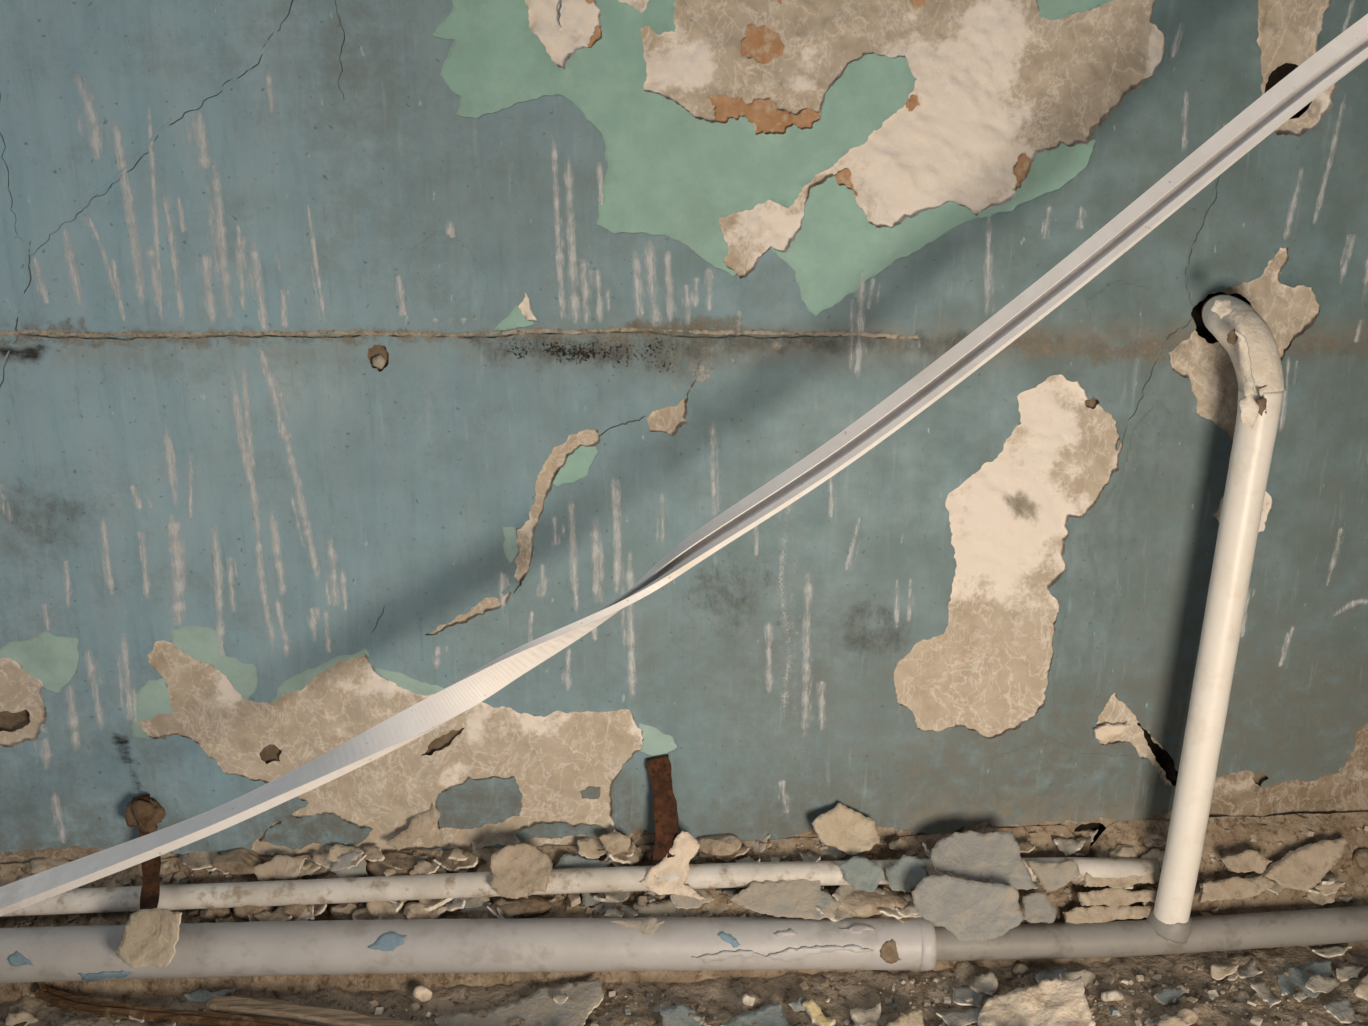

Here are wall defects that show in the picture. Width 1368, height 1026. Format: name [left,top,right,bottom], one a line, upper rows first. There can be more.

crack [0,0,919,387]
peeling [432,0,1165,317]
flaking render [1257,0,1331,96]
flaking render [1275,83,1337,137]
flaking render [1168,247,1321,440]
peeling [426,359,703,635]
peeling [894,374,1123,739]
peeling [0,631,79,748]
peeling [130,625,444,783]
peeling [247,702,677,881]
flaking render [1096,693,1178,787]
flaking render [1209,723,1368,817]